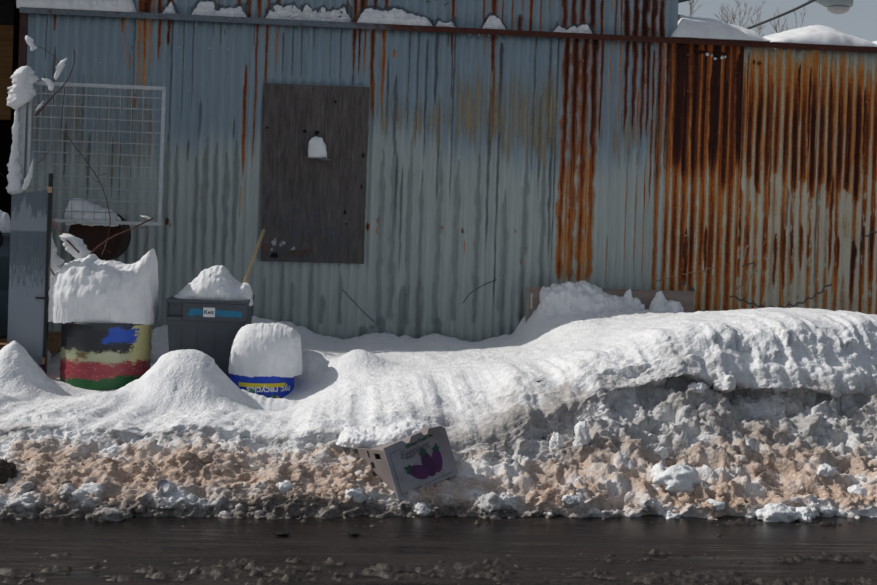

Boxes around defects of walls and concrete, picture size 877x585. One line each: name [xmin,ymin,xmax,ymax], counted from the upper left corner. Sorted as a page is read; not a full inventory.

corrosion [121,0,173,107]
corrosion [238,0,281,174]
corrosion [347,0,397,130]
corrosion [451,0,877,315]